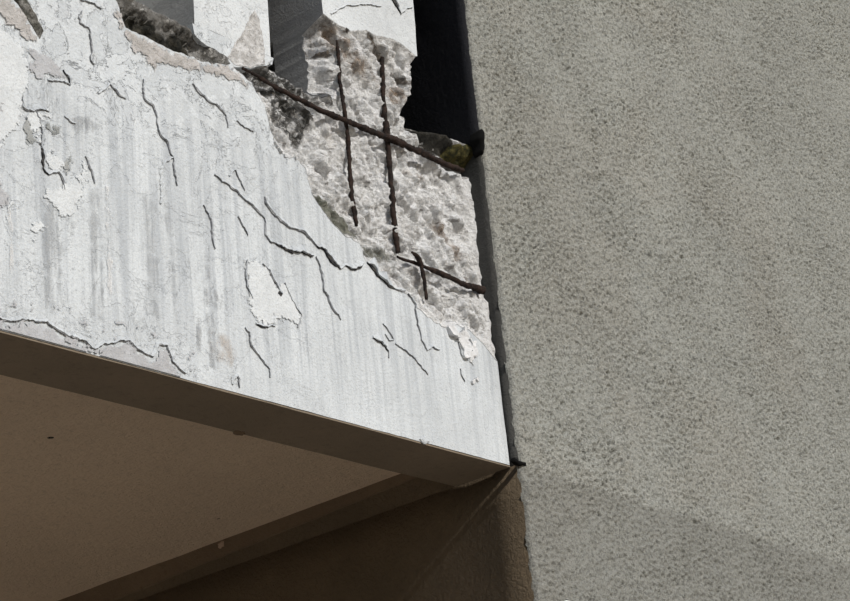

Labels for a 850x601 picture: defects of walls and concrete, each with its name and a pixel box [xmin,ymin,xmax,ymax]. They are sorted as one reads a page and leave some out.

crack [78,0,102,65]
crack [331,0,413,15]
peeling [0,0,90,219]
crack [21,95,76,190]
crack [98,79,178,204]
crack [203,205,216,249]
crack [192,83,254,132]
spalling [113,0,497,365]
corrosion [241,28,486,300]
crack [214,169,465,382]
peeling [0,295,181,376]
crack [0,315,187,374]